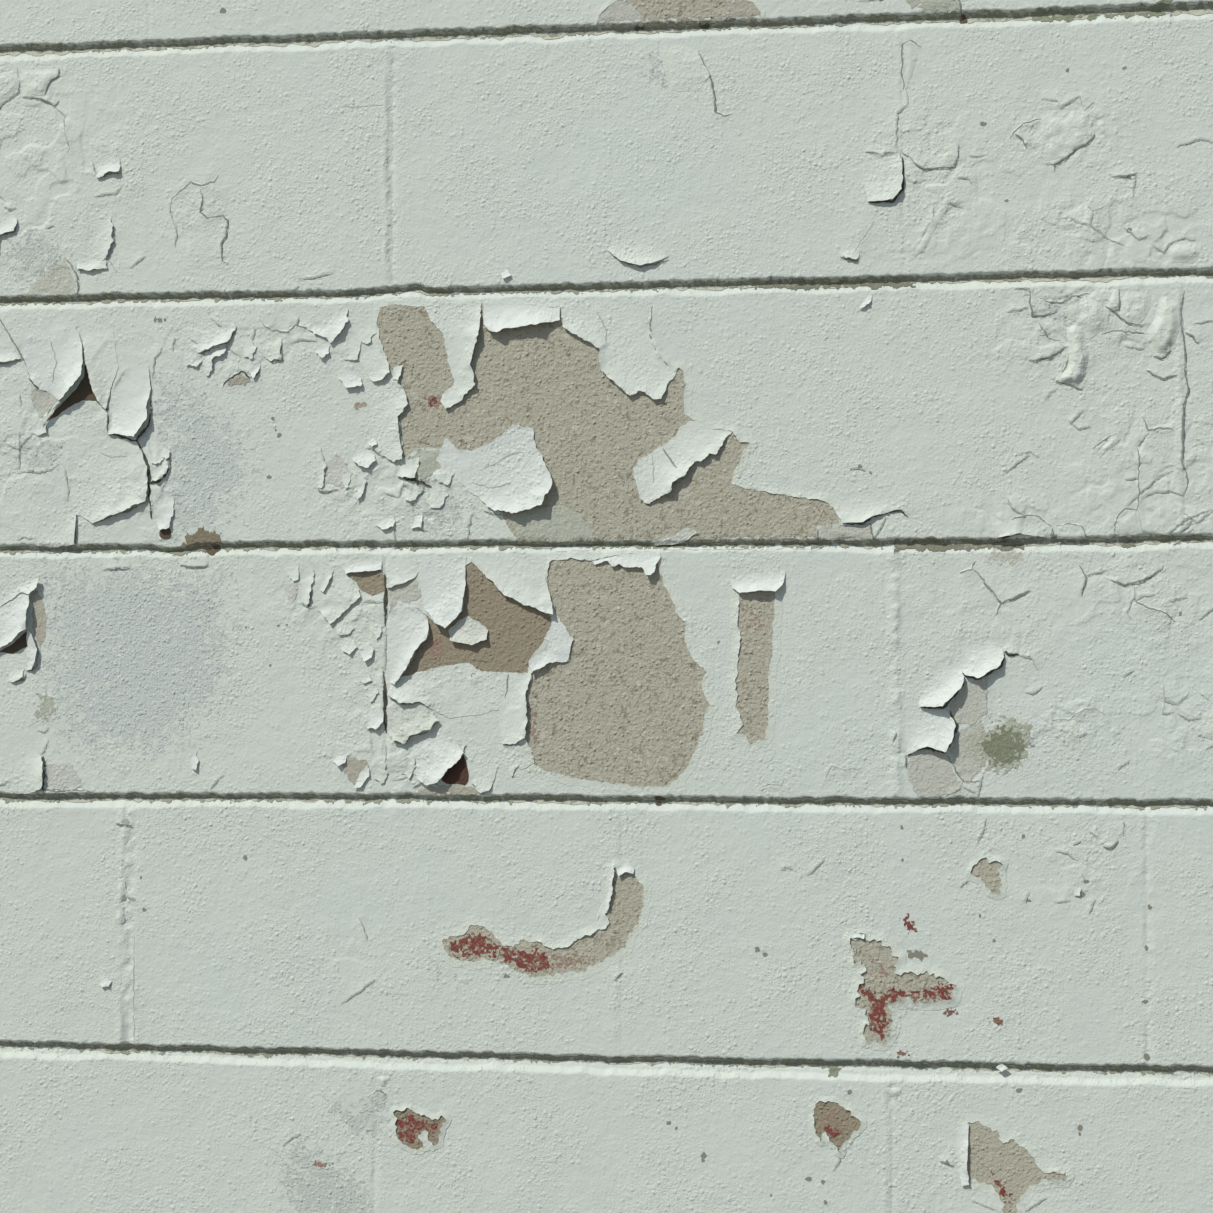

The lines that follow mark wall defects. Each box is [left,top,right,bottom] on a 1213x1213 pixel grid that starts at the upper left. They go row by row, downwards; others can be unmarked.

crack [840,40,985,262]
crack [1010,96,1095,171]
crack [1111,173,1137,195]
crack [1060,204,1196,253]
peeling [32,365,101,435]
crack [998,288,1213,540]
peeling [285,556,420,605]
peeling [333,295,846,796]
crack [1079,565,1213,621]
peeling [434,859,652,985]
peeling [842,925,966,1051]
peeling [945,1113,1075,1213]